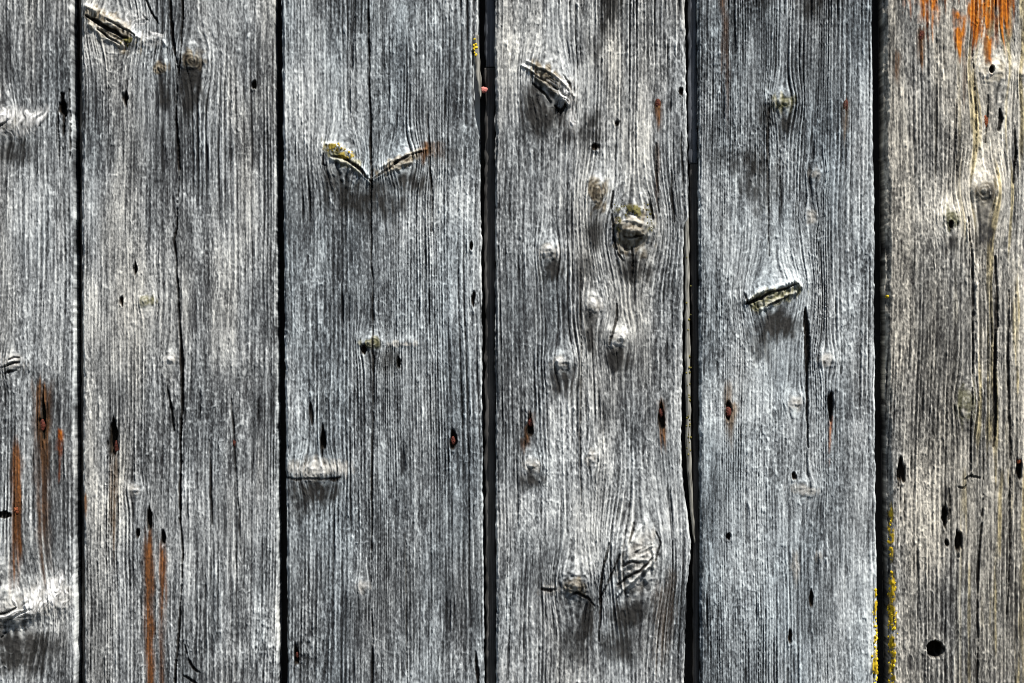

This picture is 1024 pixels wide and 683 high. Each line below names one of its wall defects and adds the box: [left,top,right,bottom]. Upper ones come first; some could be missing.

rust [919,0,937,69]
rust [955,0,1015,63]
crack [802,308,810,448]
rust [11,443,22,577]
rust [36,378,63,537]
rust [144,530,167,683]